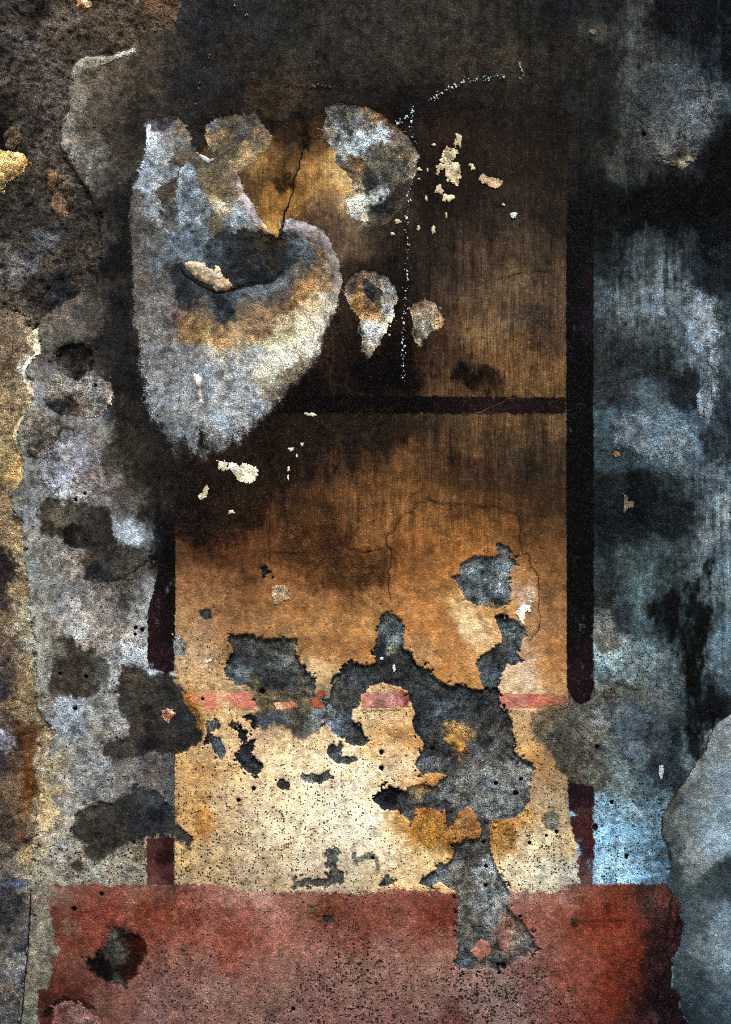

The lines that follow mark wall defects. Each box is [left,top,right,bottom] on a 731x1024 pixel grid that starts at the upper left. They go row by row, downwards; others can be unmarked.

crack [280,150,304,239]
leakage [360,106,417,378]
leakage [590,0,731,279]
efflorescence [35,430,108,506]
flaking render [0,0,541,1024]
leakage [271,584,291,605]
crack [344,500,541,640]
leakage [592,287,723,557]
leakage [605,556,728,788]